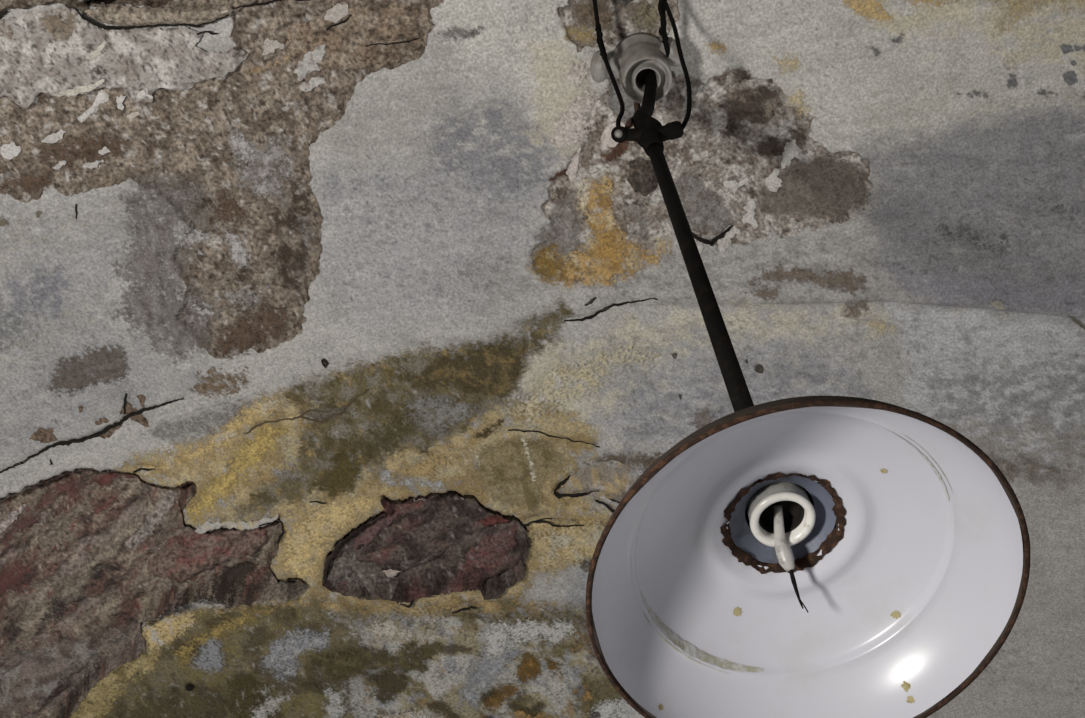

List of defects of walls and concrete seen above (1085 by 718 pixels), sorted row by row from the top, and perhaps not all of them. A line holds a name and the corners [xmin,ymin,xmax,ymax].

crack [64,0,310,35]
crack [365,38,419,47]
flaking render [0,0,443,398]
flaking render [529,0,873,285]
crack [1068,316,1085,330]
crack [0,393,184,473]
spalling [0,468,308,718]
damp [70,174,673,718]
spalling [322,491,531,605]
crack [520,475,620,527]